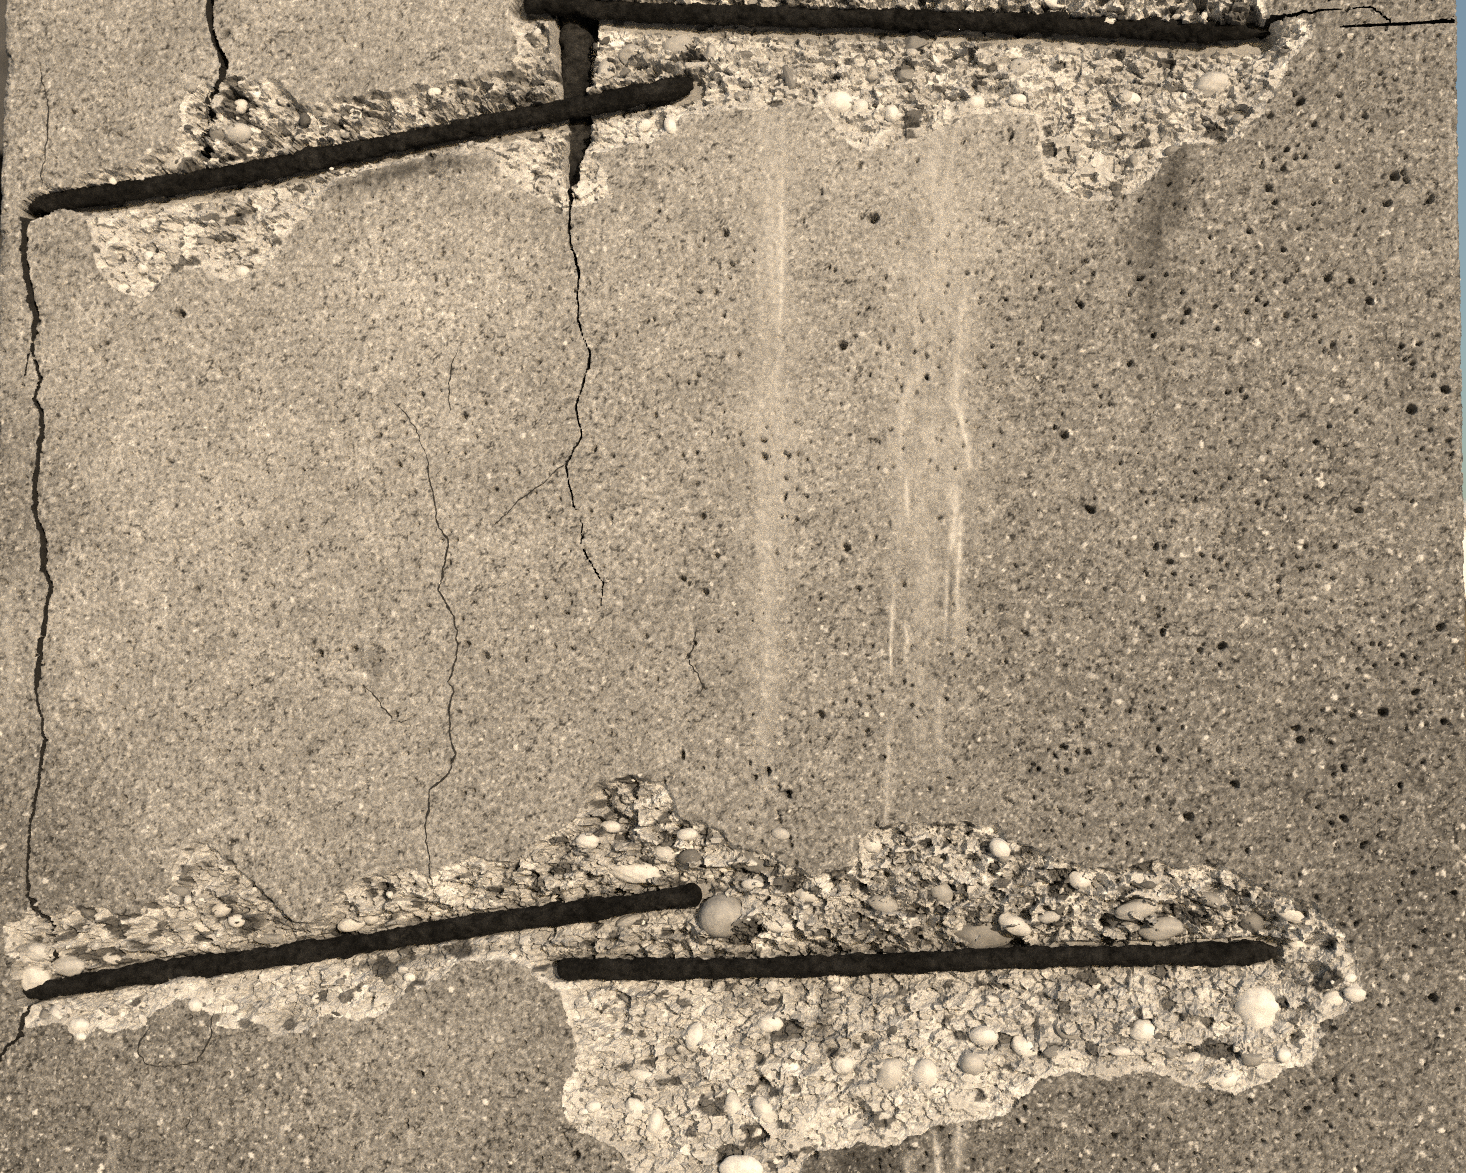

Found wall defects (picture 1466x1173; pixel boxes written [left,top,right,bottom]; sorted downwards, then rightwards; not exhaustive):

crack [201,0,229,156]
rust [362,159,459,183]
spalling [18,0,1313,298]
crack [1257,5,1397,40]
crack [494,192,605,606]
crack [0,64,59,1062]
spalling [3,774,1366,1173]